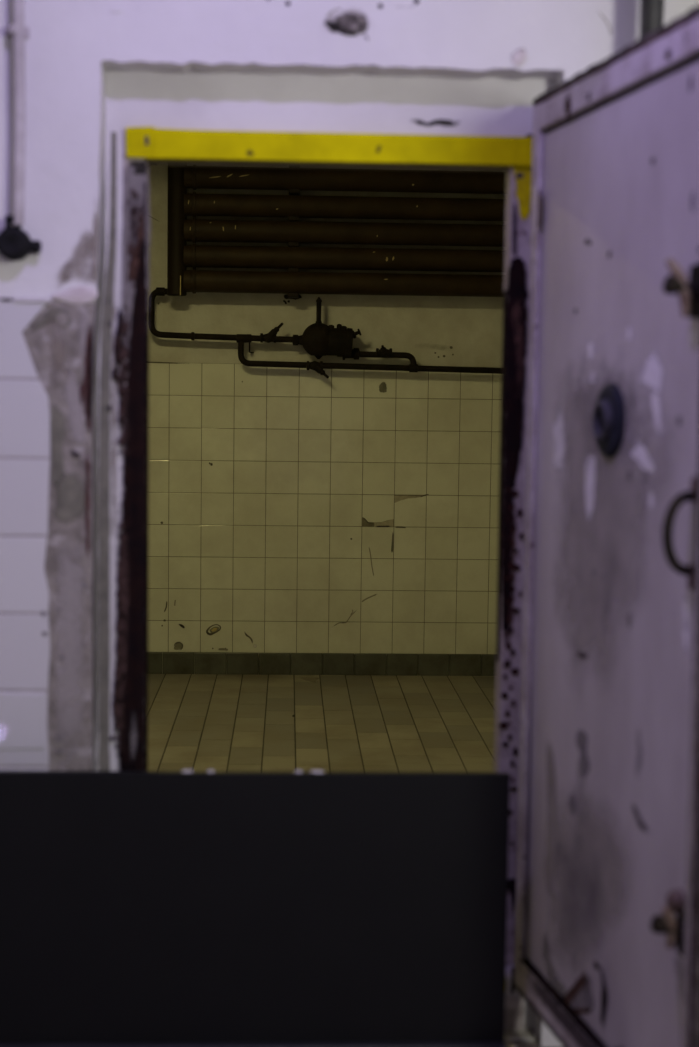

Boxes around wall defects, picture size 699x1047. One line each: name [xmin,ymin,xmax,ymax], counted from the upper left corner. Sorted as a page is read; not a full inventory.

peeling [1,286,98,771]
corrosion [107,164,149,771]
corrosion [496,205,531,920]